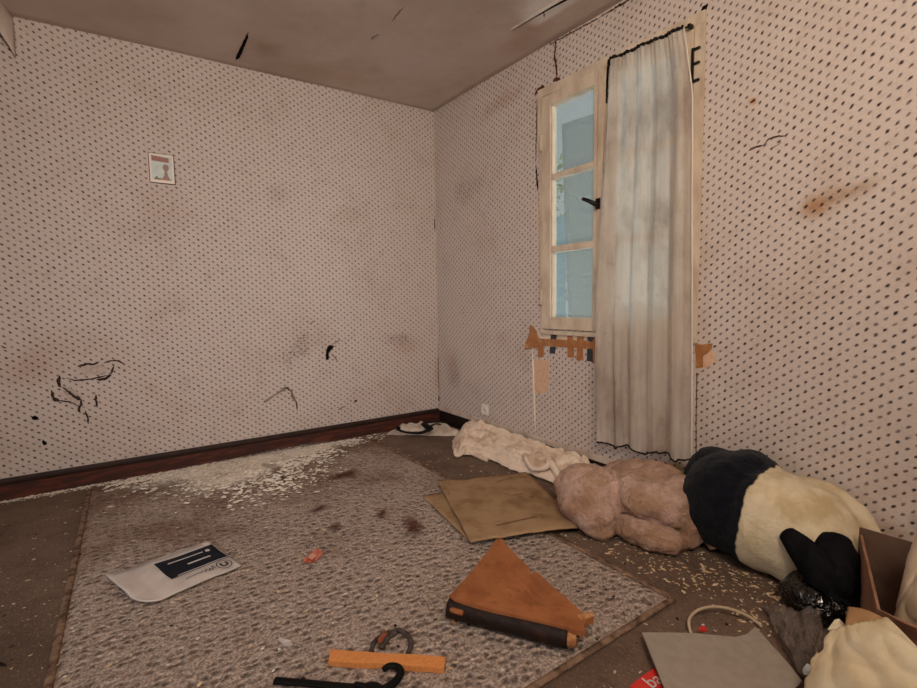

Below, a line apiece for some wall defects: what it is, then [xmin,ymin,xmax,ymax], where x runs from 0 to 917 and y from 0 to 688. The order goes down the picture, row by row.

crack [537,0,629,89]